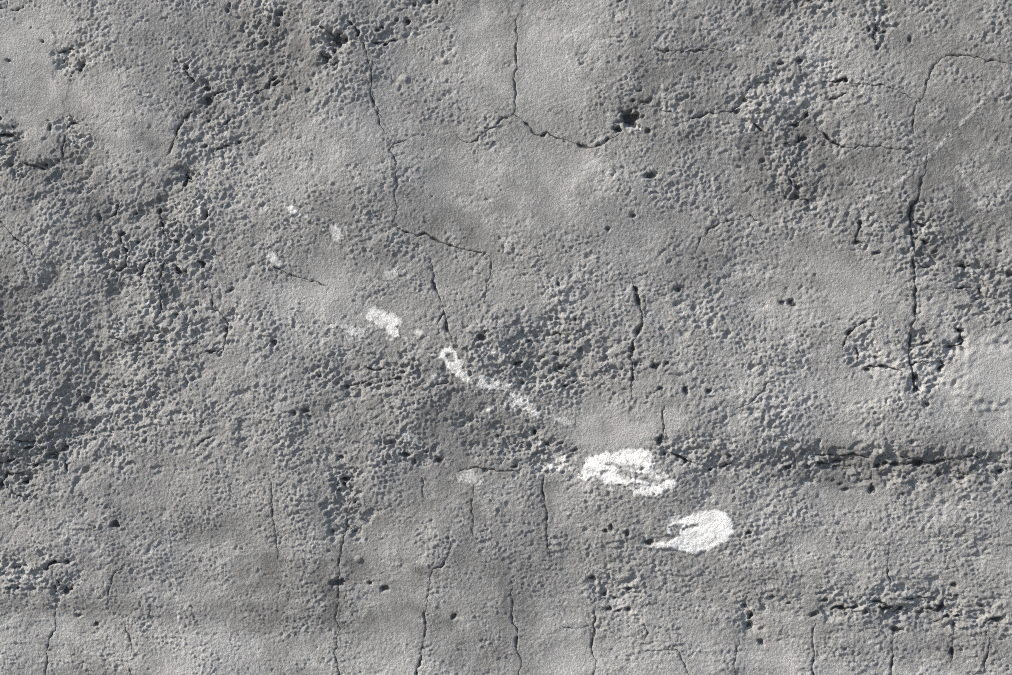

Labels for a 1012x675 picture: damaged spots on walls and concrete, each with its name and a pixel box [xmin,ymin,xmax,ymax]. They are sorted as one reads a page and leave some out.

crack [457,21,618,149]
crack [355,39,492,343]
damp [649,222,752,316]
crack [821,55,1008,398]
crack [629,281,646,398]
crack [333,479,360,675]
crack [416,487,474,675]
damp [457,484,485,562]
crack [510,582,522,672]
damp [573,607,608,675]
damp [589,484,621,572]